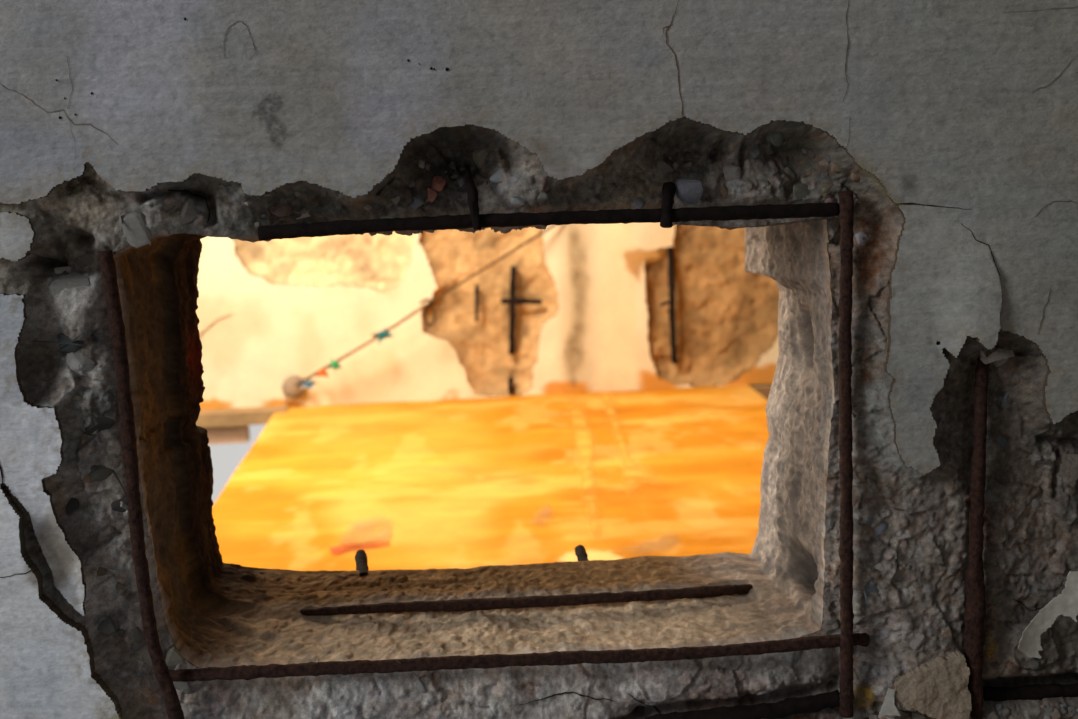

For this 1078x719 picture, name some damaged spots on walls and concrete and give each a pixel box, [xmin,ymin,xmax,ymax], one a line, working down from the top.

crack [0,55,118,154]
crack [663,0,683,116]
crack [896,203,1002,334]
spalling [119,117,1078,719]
crack [520,692,660,713]